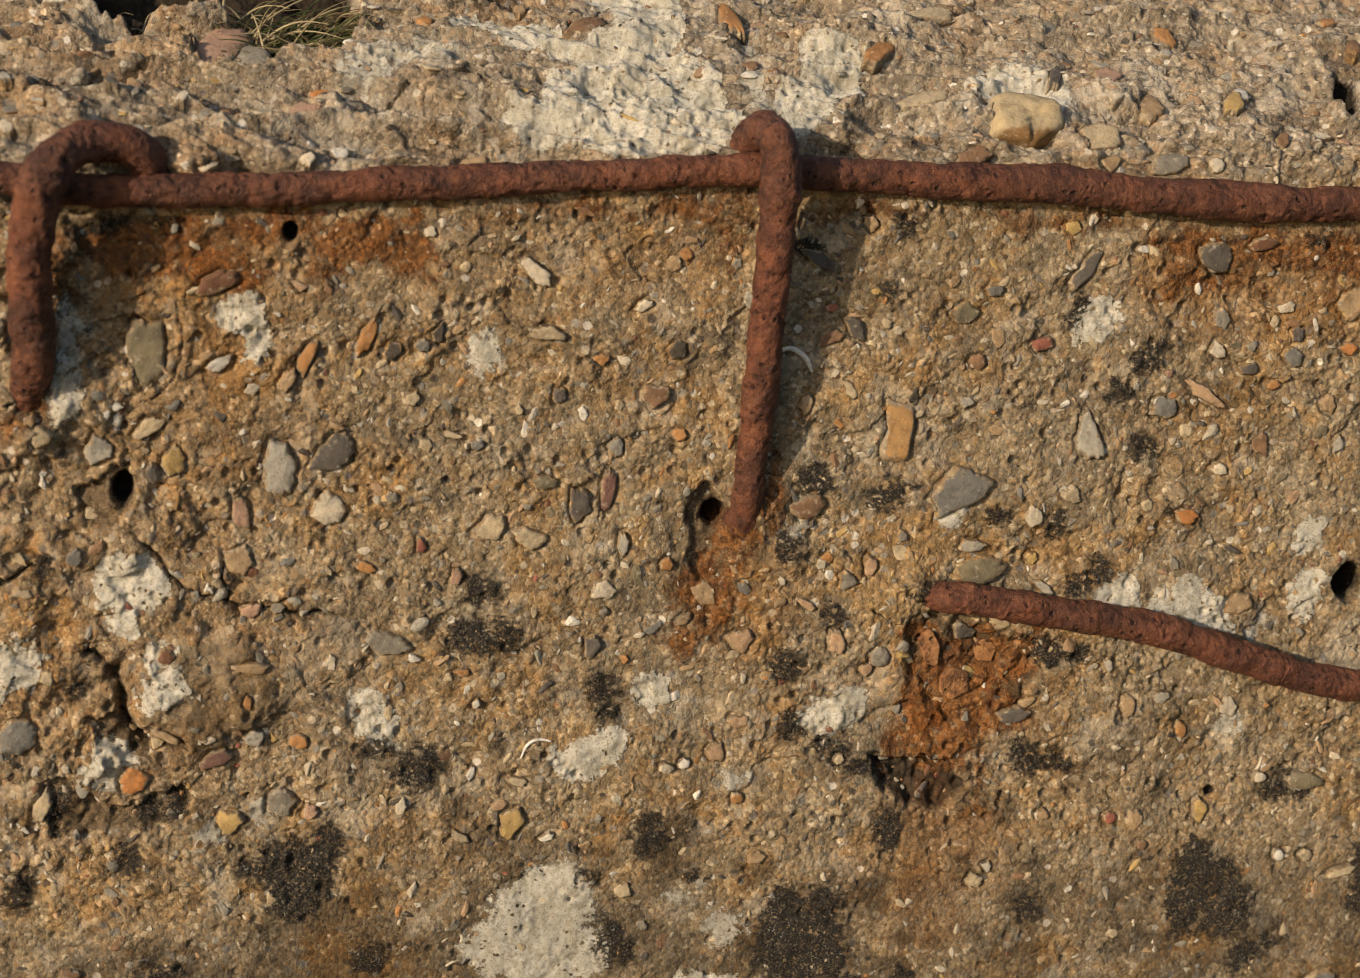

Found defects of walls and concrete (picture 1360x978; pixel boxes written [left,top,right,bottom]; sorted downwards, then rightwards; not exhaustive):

rust [501,189,755,262]
rust [816,199,894,225]
rust [998,208,1121,236]
rust [51,205,441,326]
rust [1147,223,1360,303]
rust [0,399,51,446]
spalling [13,389,55,430]
spalling [76,462,134,524]
crack [0,563,32,585]
spalling [685,481,734,573]
rust [655,443,787,662]